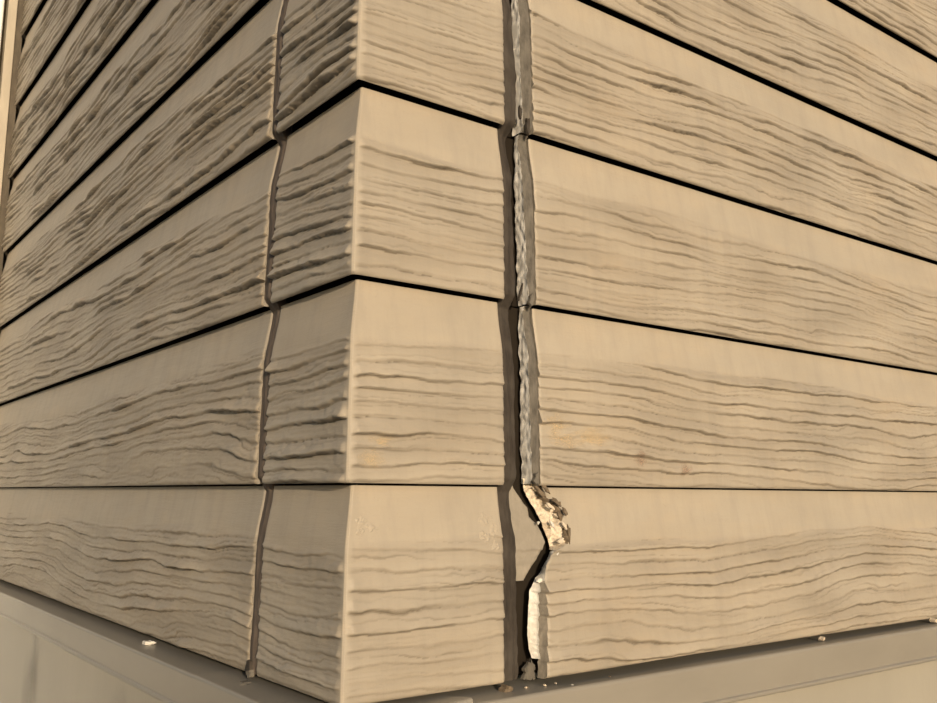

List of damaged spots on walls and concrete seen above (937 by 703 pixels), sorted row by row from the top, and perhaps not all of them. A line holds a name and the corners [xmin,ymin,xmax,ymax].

crack [505,0,573,689]